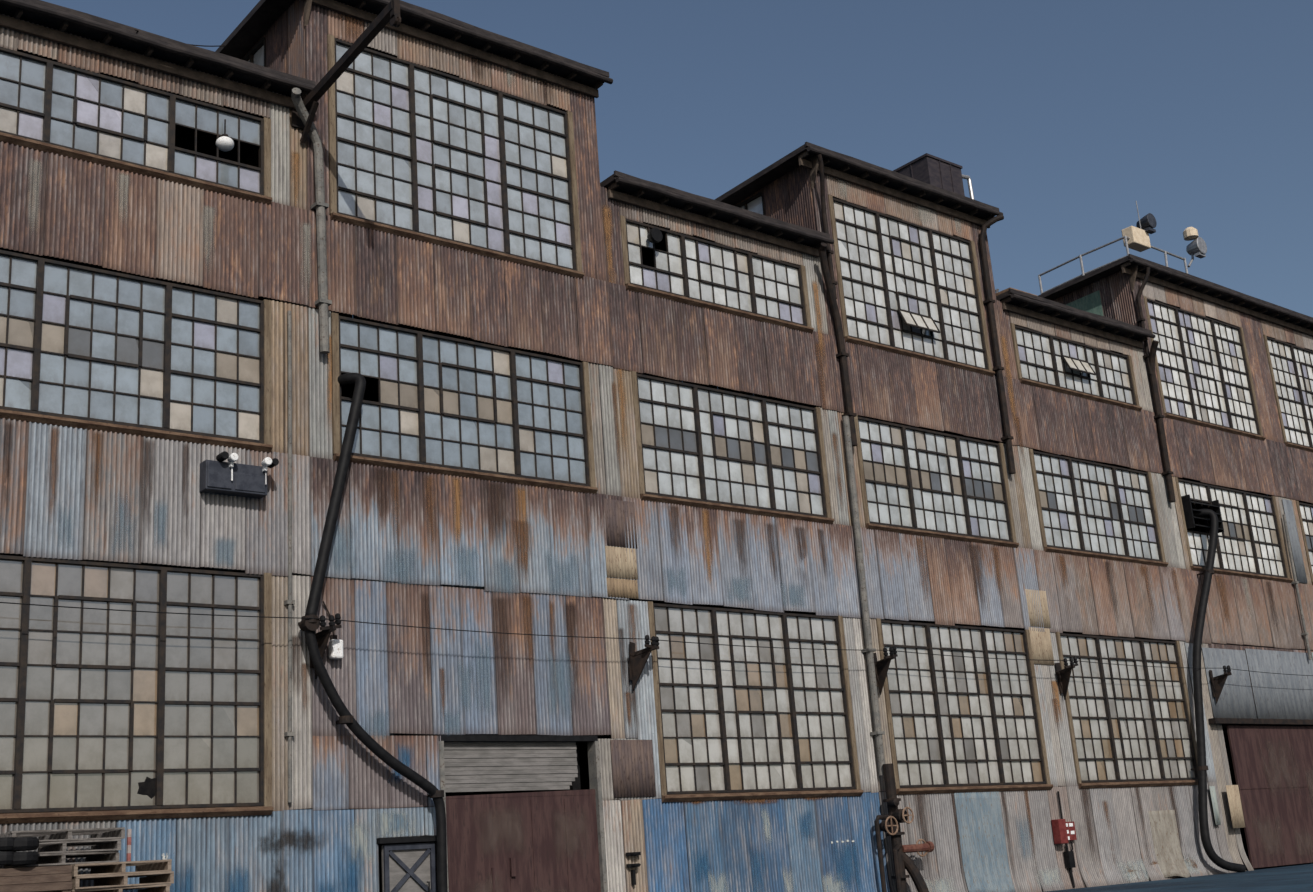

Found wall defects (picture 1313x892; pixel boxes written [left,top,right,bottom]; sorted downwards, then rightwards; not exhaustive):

rust [50,429,58,507]
rust [970,546,1002,596]
rust [422,595,444,708]
rust [550,604,576,684]